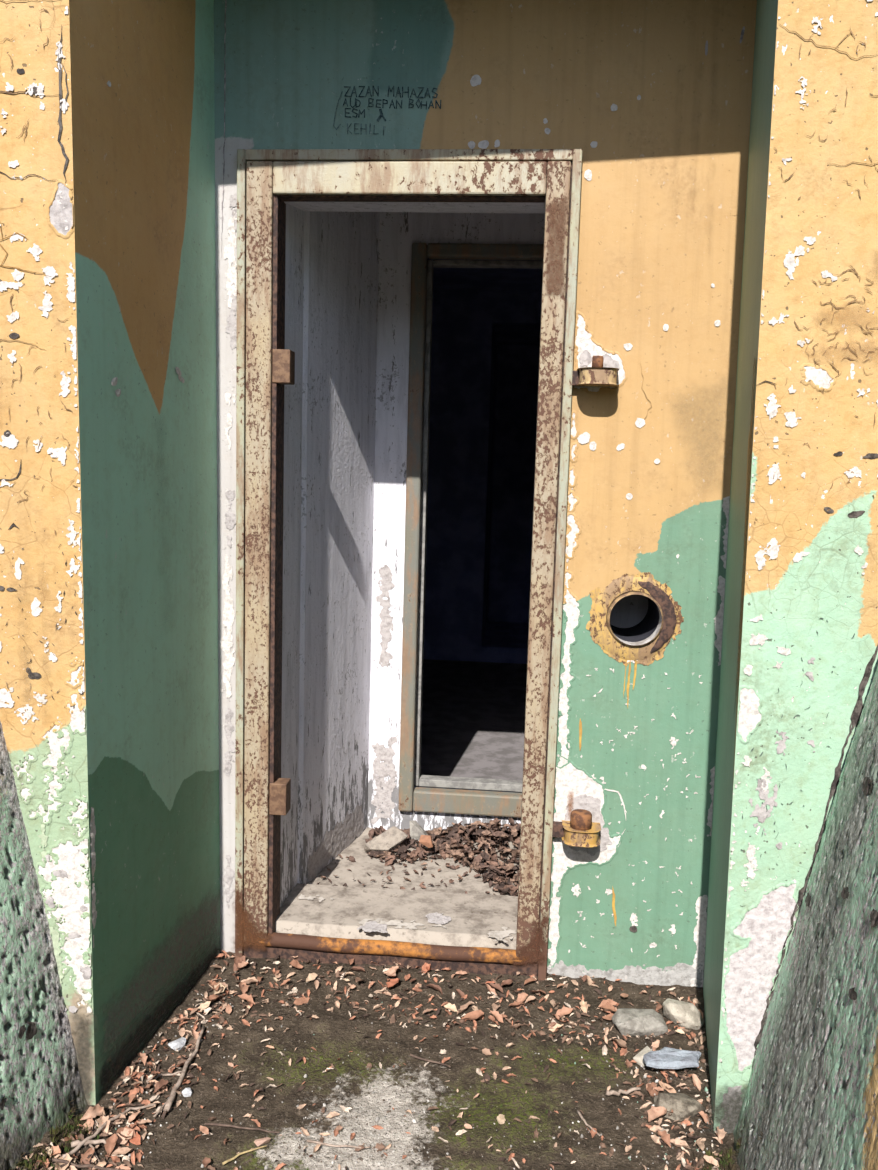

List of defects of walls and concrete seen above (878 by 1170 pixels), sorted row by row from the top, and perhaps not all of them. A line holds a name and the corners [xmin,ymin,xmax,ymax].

crack [0,0,69,183]
spalling [46,179,74,239]
corrosion [547,198,567,294]
crack [757,265,878,425]
crack [0,339,76,551]
peeling [0,426,97,1017]
peeling [547,410,715,987]
corrosion [638,581,676,653]
corrosion [234,894,270,950]
corrosion [514,916,546,965]
peeling [719,665,878,1170]
crack [741,633,878,1081]